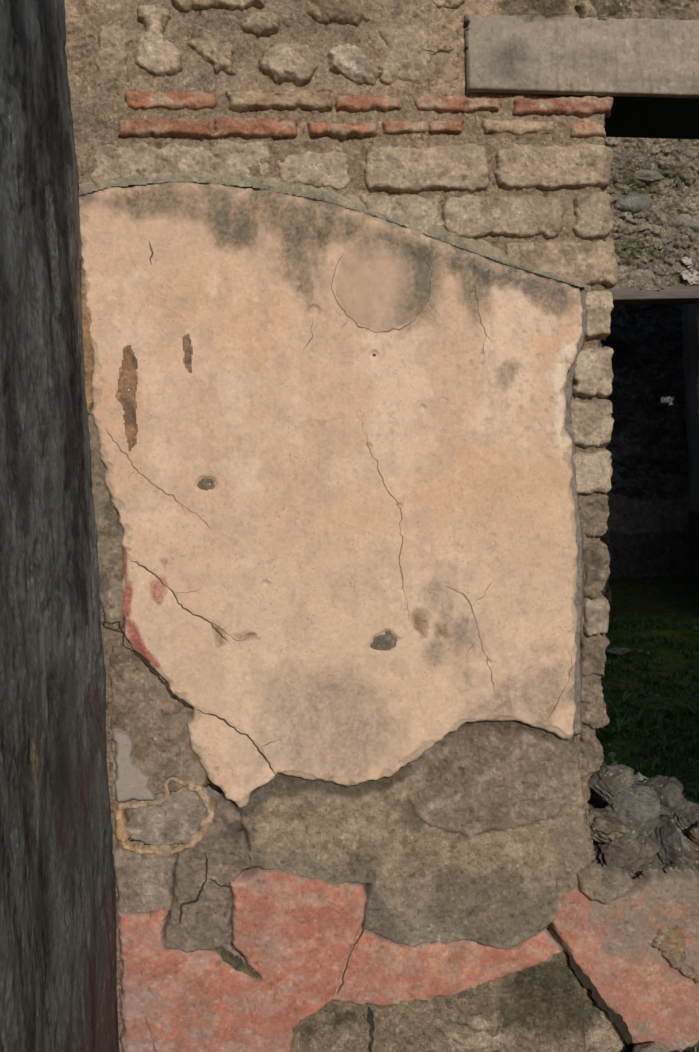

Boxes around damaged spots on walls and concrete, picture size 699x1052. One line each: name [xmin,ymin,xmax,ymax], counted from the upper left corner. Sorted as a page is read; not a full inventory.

water stain [207,191,358,291]
water stain [400,246,511,307]
water stain [183,334,193,373]
water stain [115,345,138,451]
crack [362,422,410,620]
crack [126,556,251,644]
spalling [81,259,596,979]
crack [100,621,283,775]
crack [176,854,232,926]
crack [367,1006,375,1052]
spalling [433,986,554,1052]
spalling [583,987,627,1052]